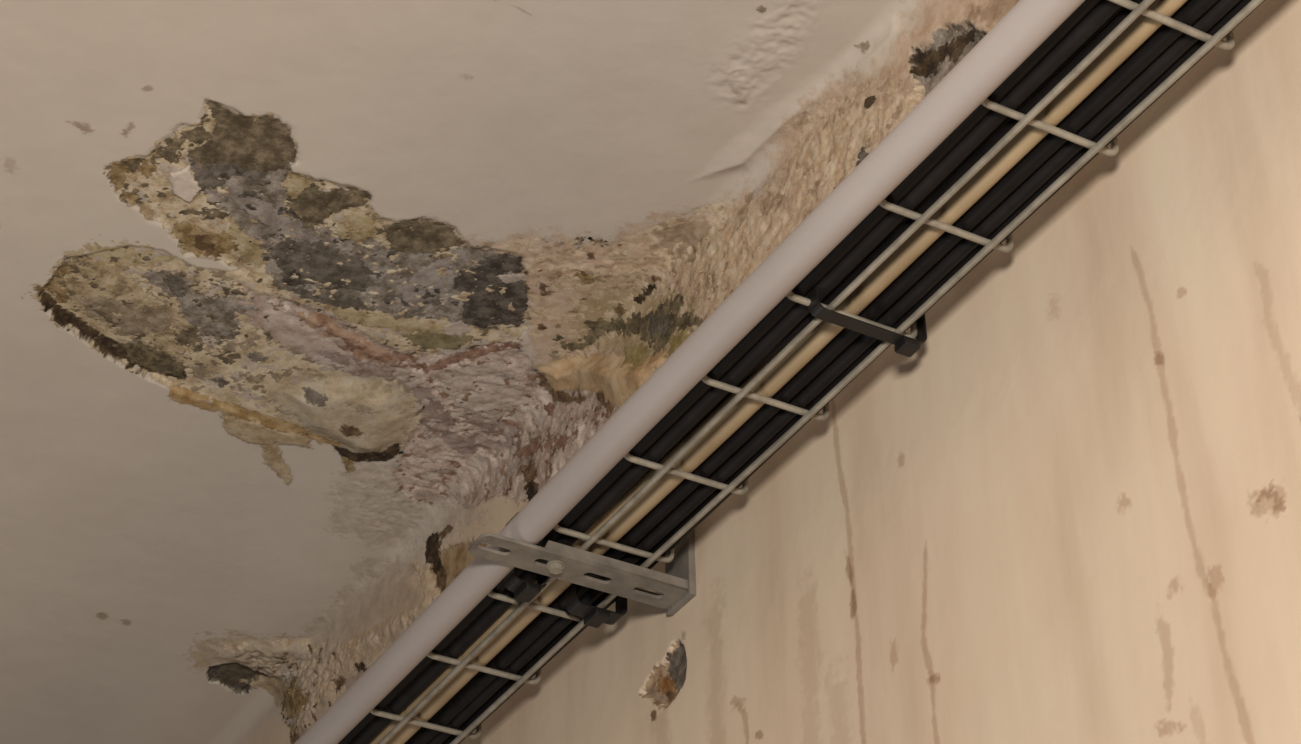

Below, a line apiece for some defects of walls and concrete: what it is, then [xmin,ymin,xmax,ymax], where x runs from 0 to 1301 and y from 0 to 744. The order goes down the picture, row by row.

leakage [776,0,1020,185]
spalling [908,21,987,103]
spalling [25,99,620,508]
leakage [525,237,727,374]
flaking render [207,561,440,744]
spalling [639,641,687,721]